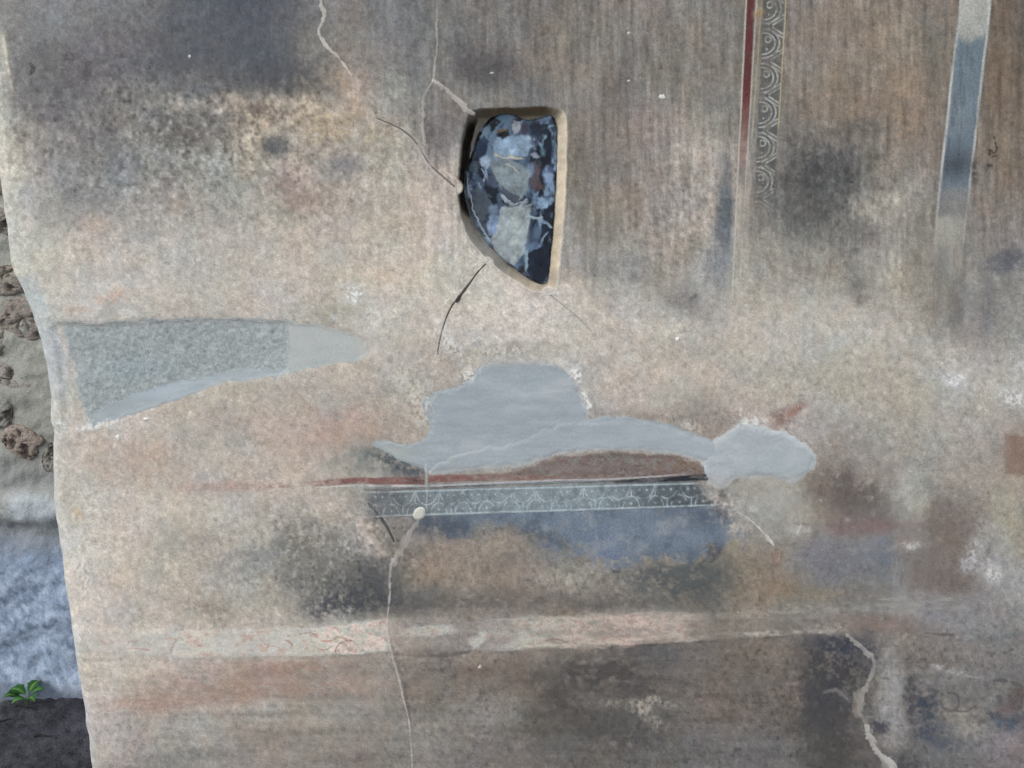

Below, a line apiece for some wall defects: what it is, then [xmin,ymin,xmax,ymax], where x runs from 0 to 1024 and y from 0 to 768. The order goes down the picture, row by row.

crack [369,111,462,194]
spalling [455,104,570,295]
crack [431,257,493,362]
spalling [570,369,592,410]
crack [361,497,402,641]
crack [845,634,874,693]
crack [865,724,897,768]